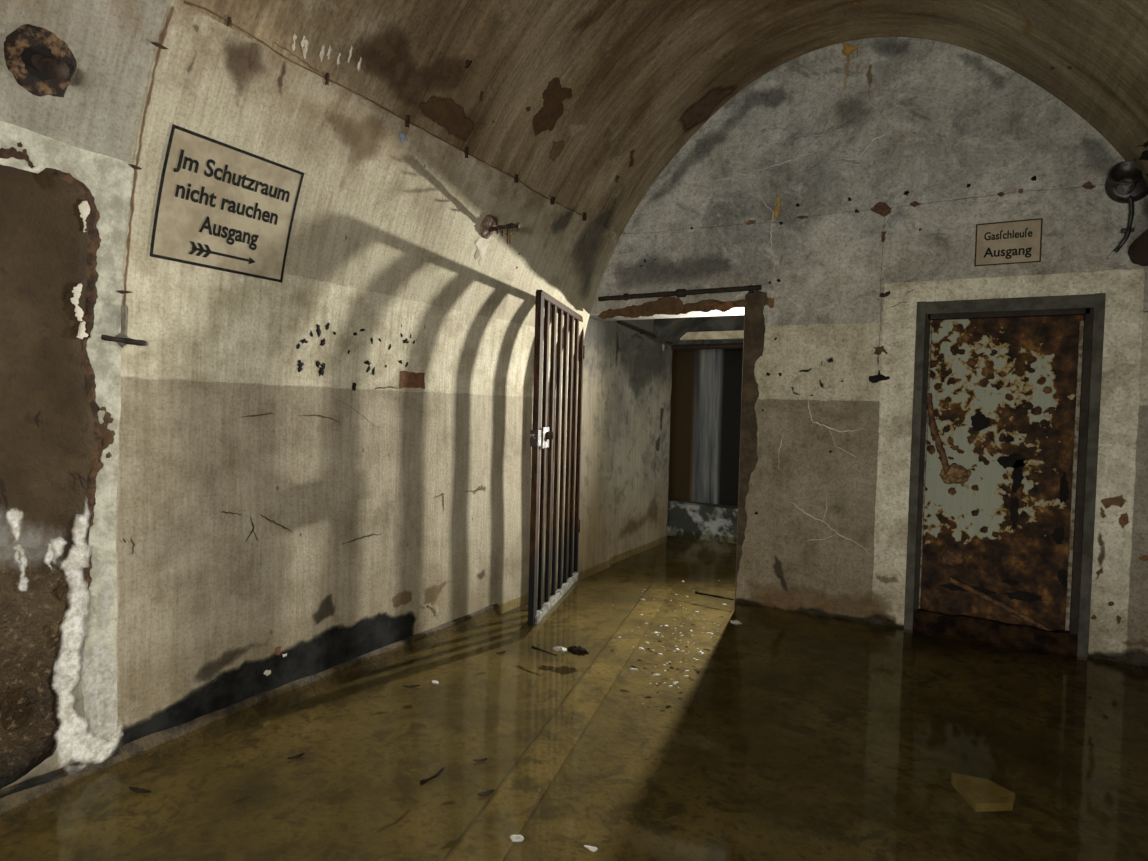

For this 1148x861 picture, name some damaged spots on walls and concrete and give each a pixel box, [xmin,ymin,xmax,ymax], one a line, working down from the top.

peeling [419,96,474,141]
peeling [526,77,572,136]
flaking render [0,142,115,790]
flaking render [598,290,768,602]
crack [808,395,859,457]
crack [794,495,867,551]
leakage [425,582,446,606]
leakage [0,508,416,798]